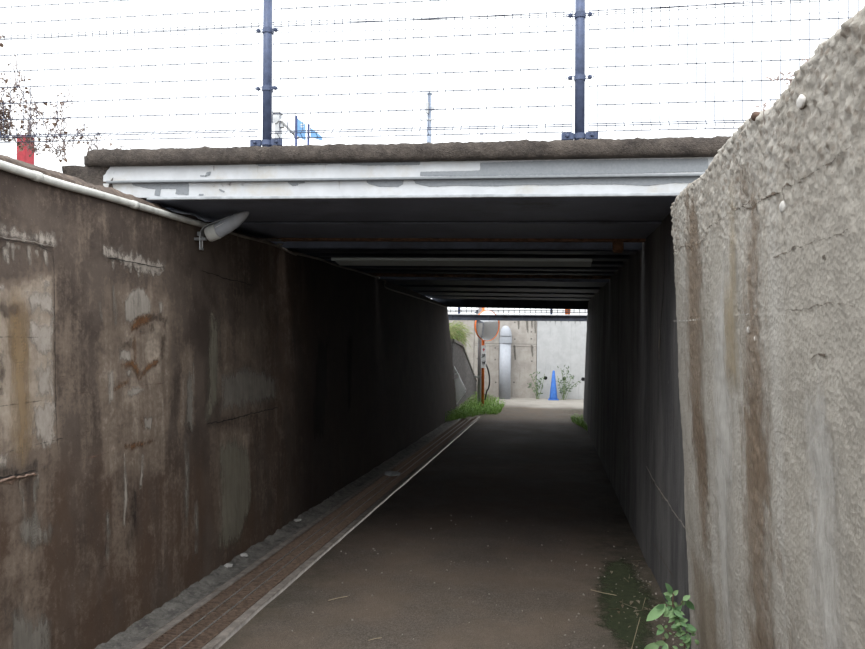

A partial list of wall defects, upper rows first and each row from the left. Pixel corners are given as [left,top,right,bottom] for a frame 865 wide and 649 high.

peeling [256,158,708,187]
crack [674,146,851,252]
peeling [103,246,163,277]
rust [121,314,168,375]
leakage [686,203,735,632]
leakage [744,237,773,649]